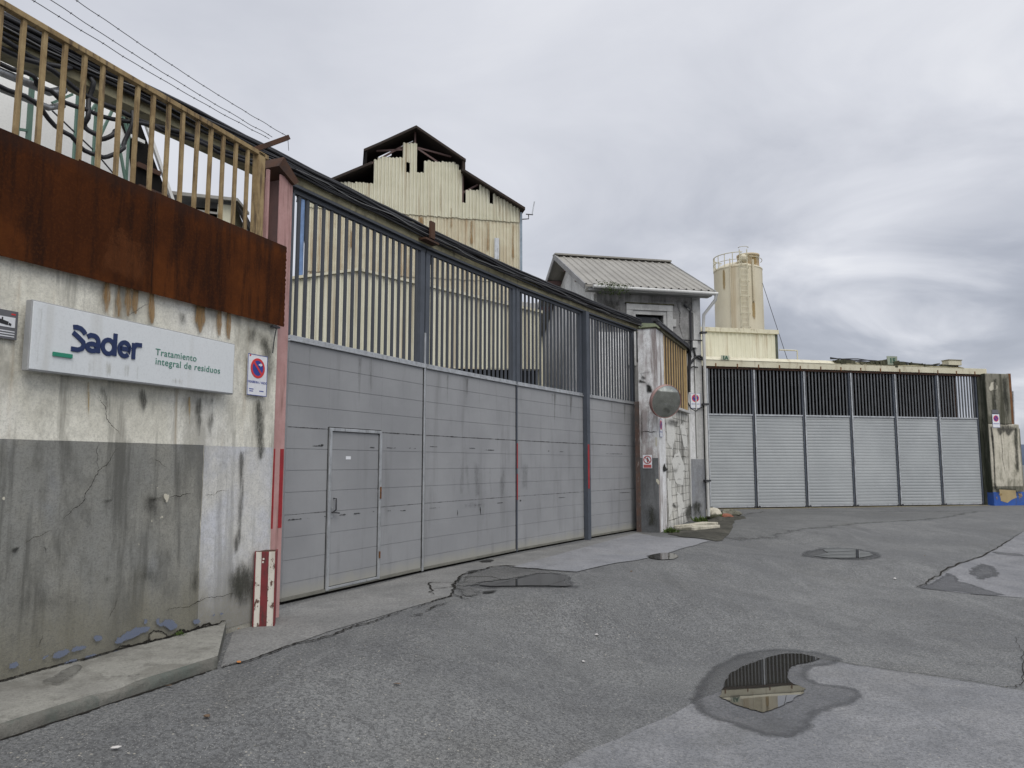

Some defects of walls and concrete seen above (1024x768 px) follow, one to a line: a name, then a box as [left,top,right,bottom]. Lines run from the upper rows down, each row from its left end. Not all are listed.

rust [0,128,287,338]
crack [27,397,118,542]
water stain [235,452,244,551]
water stain [231,566,254,600]
peeling [114,619,177,652]